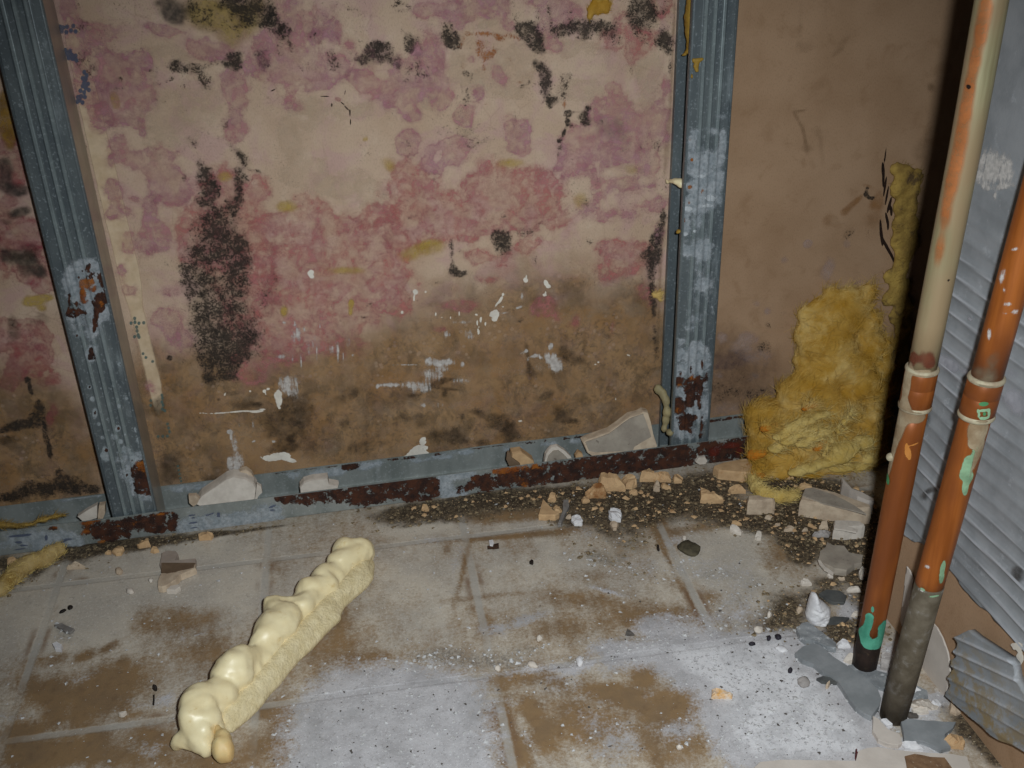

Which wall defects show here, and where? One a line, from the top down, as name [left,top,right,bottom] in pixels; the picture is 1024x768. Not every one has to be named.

damp [0,93,31,229]
damp [0,241,102,506]
rust [62,259,110,362]
damp [61,0,675,486]
rust [0,316,748,551]
rust [683,115,727,303]